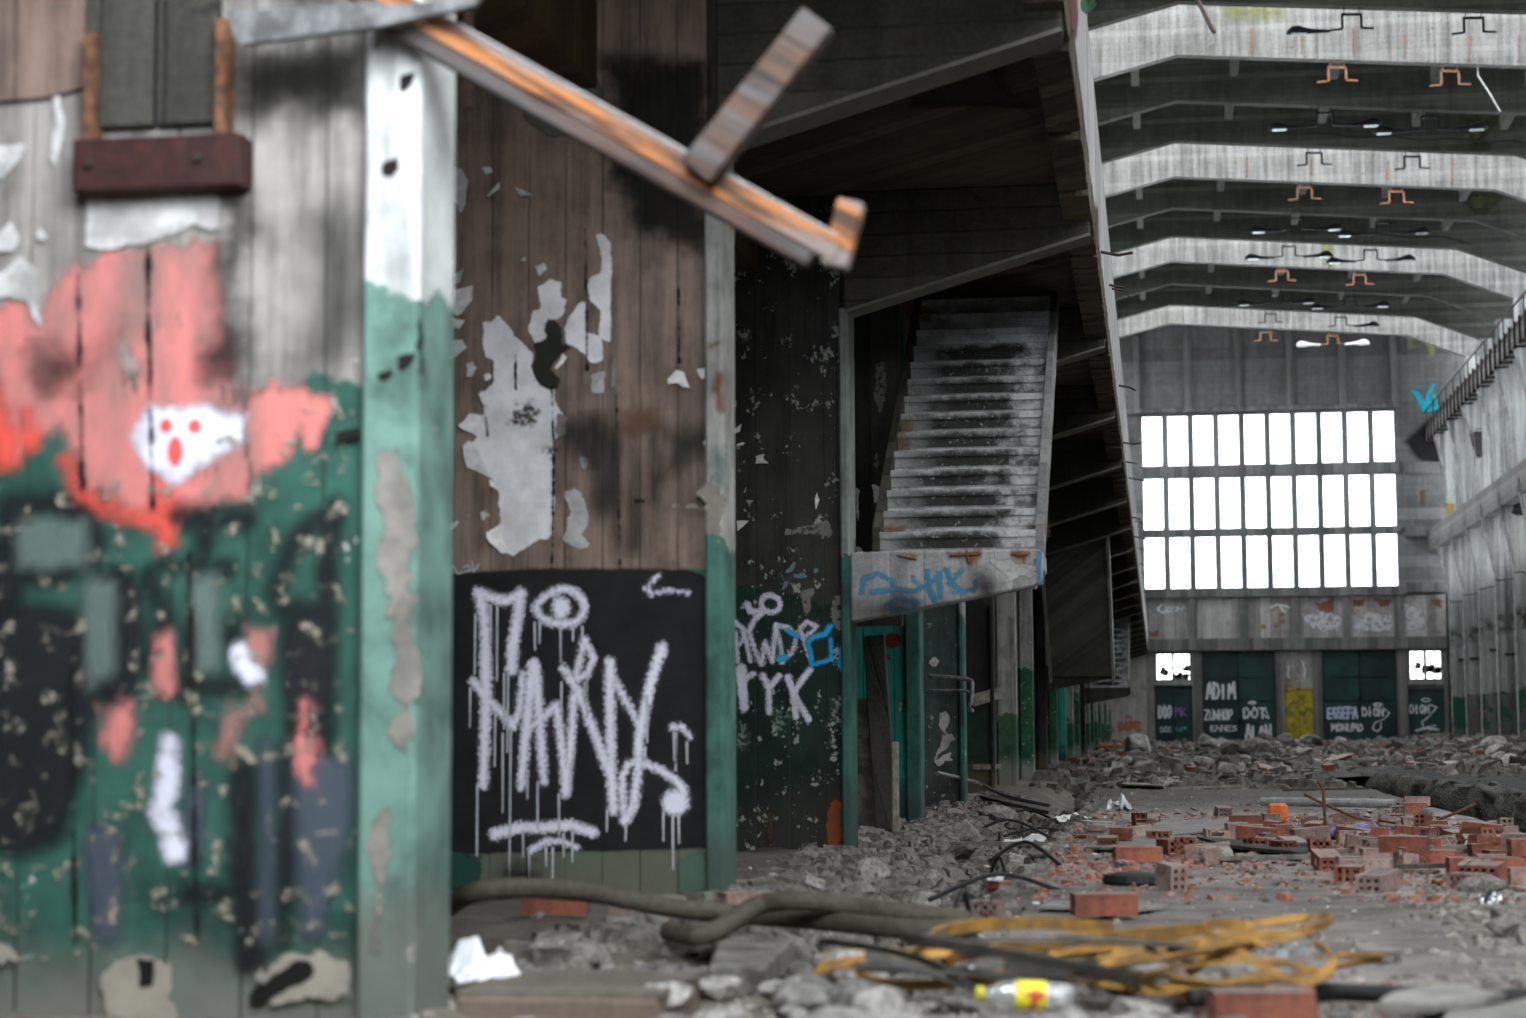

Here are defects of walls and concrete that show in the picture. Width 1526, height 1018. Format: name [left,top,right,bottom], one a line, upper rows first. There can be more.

peeling [0,143,27,178]
peeling [49,95,66,166]
peeling [0,222,47,325]
spalling [303,397,360,446]
peeling [452,234,616,556]
peeling [215,536,324,623]
peeling [300,622,320,638]
peeling [374,447,422,752]
peeling [185,657,210,716]
peeling [41,692,94,782]
peeling [235,706,340,763]
peeling [298,806,392,954]